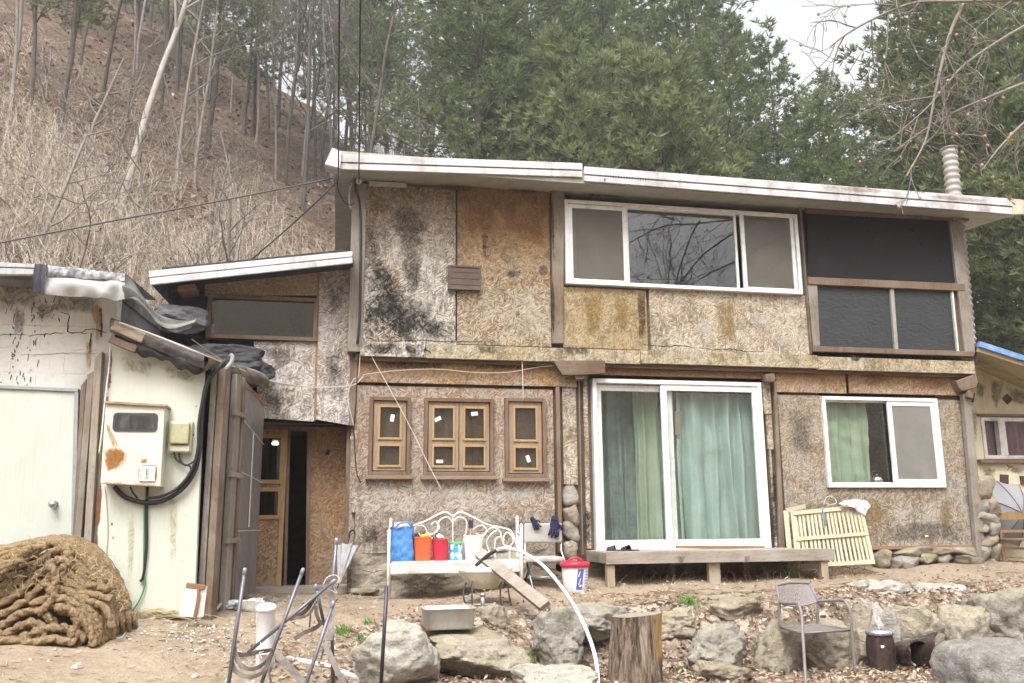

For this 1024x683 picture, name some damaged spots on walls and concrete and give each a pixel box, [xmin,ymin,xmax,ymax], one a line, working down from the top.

crack [2,312,106,355]
water stain [365,204,442,369]
rust [94,353,124,545]